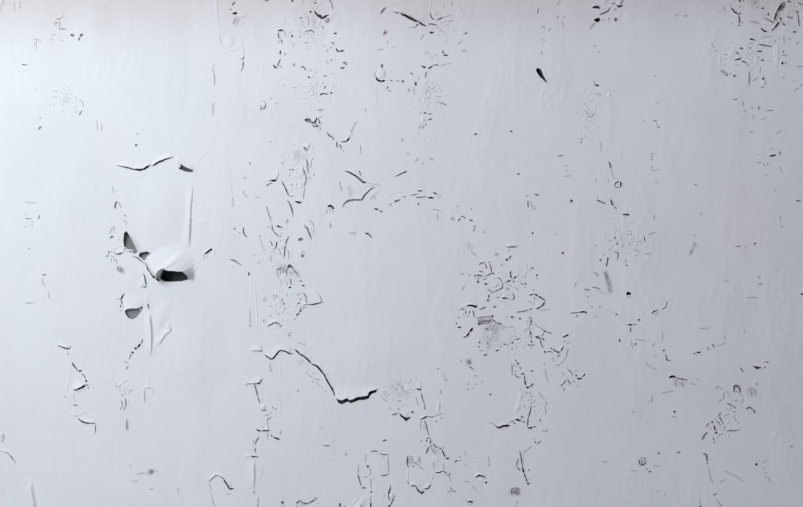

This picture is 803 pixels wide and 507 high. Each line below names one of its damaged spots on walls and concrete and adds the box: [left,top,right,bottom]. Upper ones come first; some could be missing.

spalling [589,0,627,29]
spalling [711,0,803,78]
spalling [407,63,452,146]
peeling [106,152,211,289]
peeling [297,220,315,246]
spalling [461,243,527,286]
peeling [64,352,97,434]
peeling [250,259,443,436]
peeling [514,382,548,432]
peeling [534,324,554,354]
spalling [556,360,586,391]
crack [420,435,473,505]